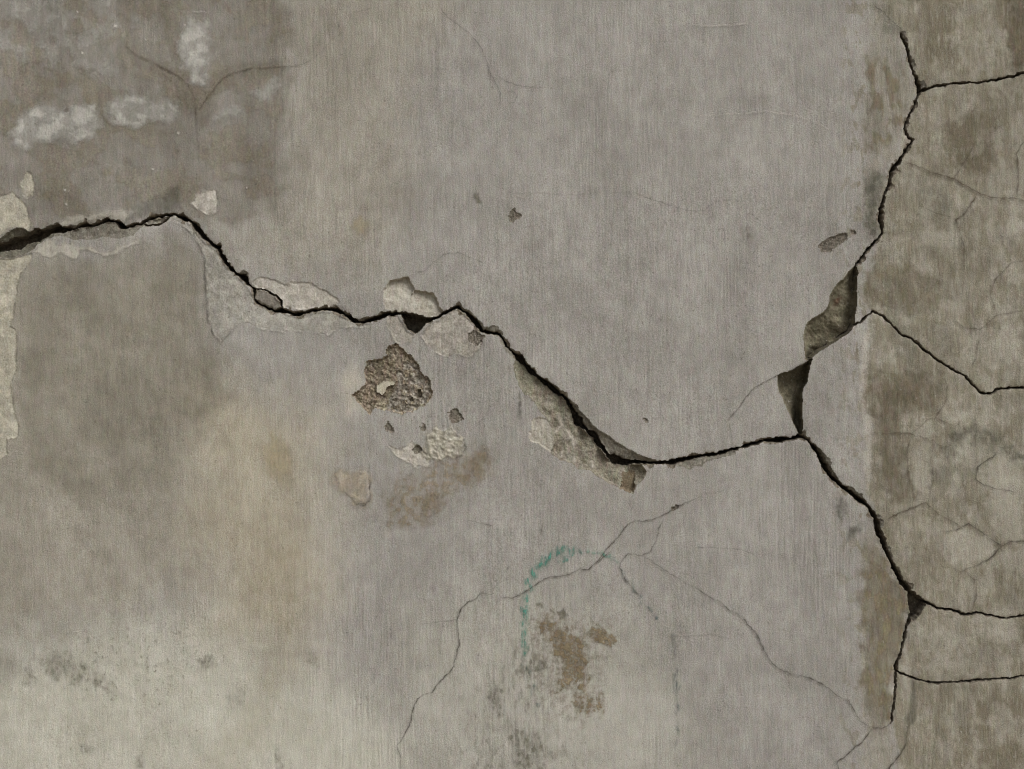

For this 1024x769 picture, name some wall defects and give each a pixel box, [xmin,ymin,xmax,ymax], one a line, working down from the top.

peeling [0,172,34,235]
peeling [192,190,218,214]
peeling [176,219,371,339]
spalling [818,230,857,253]
crack [800,8,1024,395]
peeling [0,255,32,459]
spalling [352,276,486,433]
peeling [388,408,464,468]
crack [0,212,1024,769]
spalling [513,360,647,494]